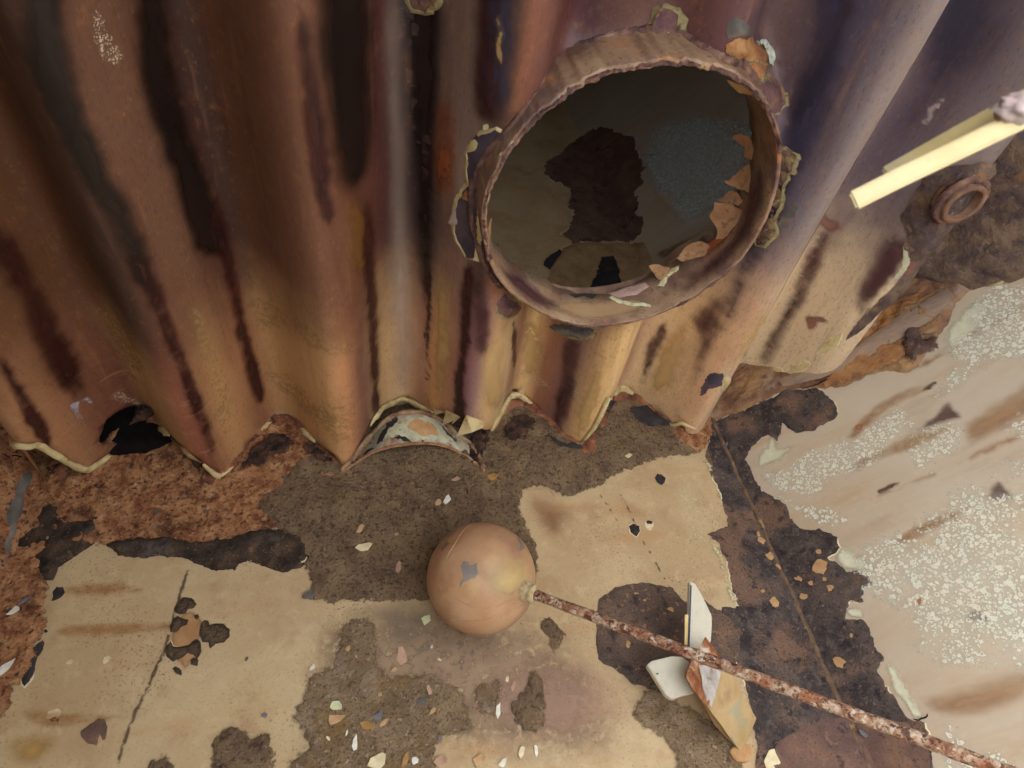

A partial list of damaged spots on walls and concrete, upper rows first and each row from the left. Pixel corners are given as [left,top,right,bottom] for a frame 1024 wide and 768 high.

corrosion [23,0,213,442]
corrosion [140,0,263,402]
corrosion [299,0,371,223]
peeling [543,126,647,269]
peeling [649,134,754,280]
corrosion [726,0,851,269]
corrosion [710,215,970,422]
corrosion [0,364,339,717]
spalling [8,405,332,479]
peeling [367,752,386,768]
peeling [596,582,742,768]
peeling [704,388,934,768]